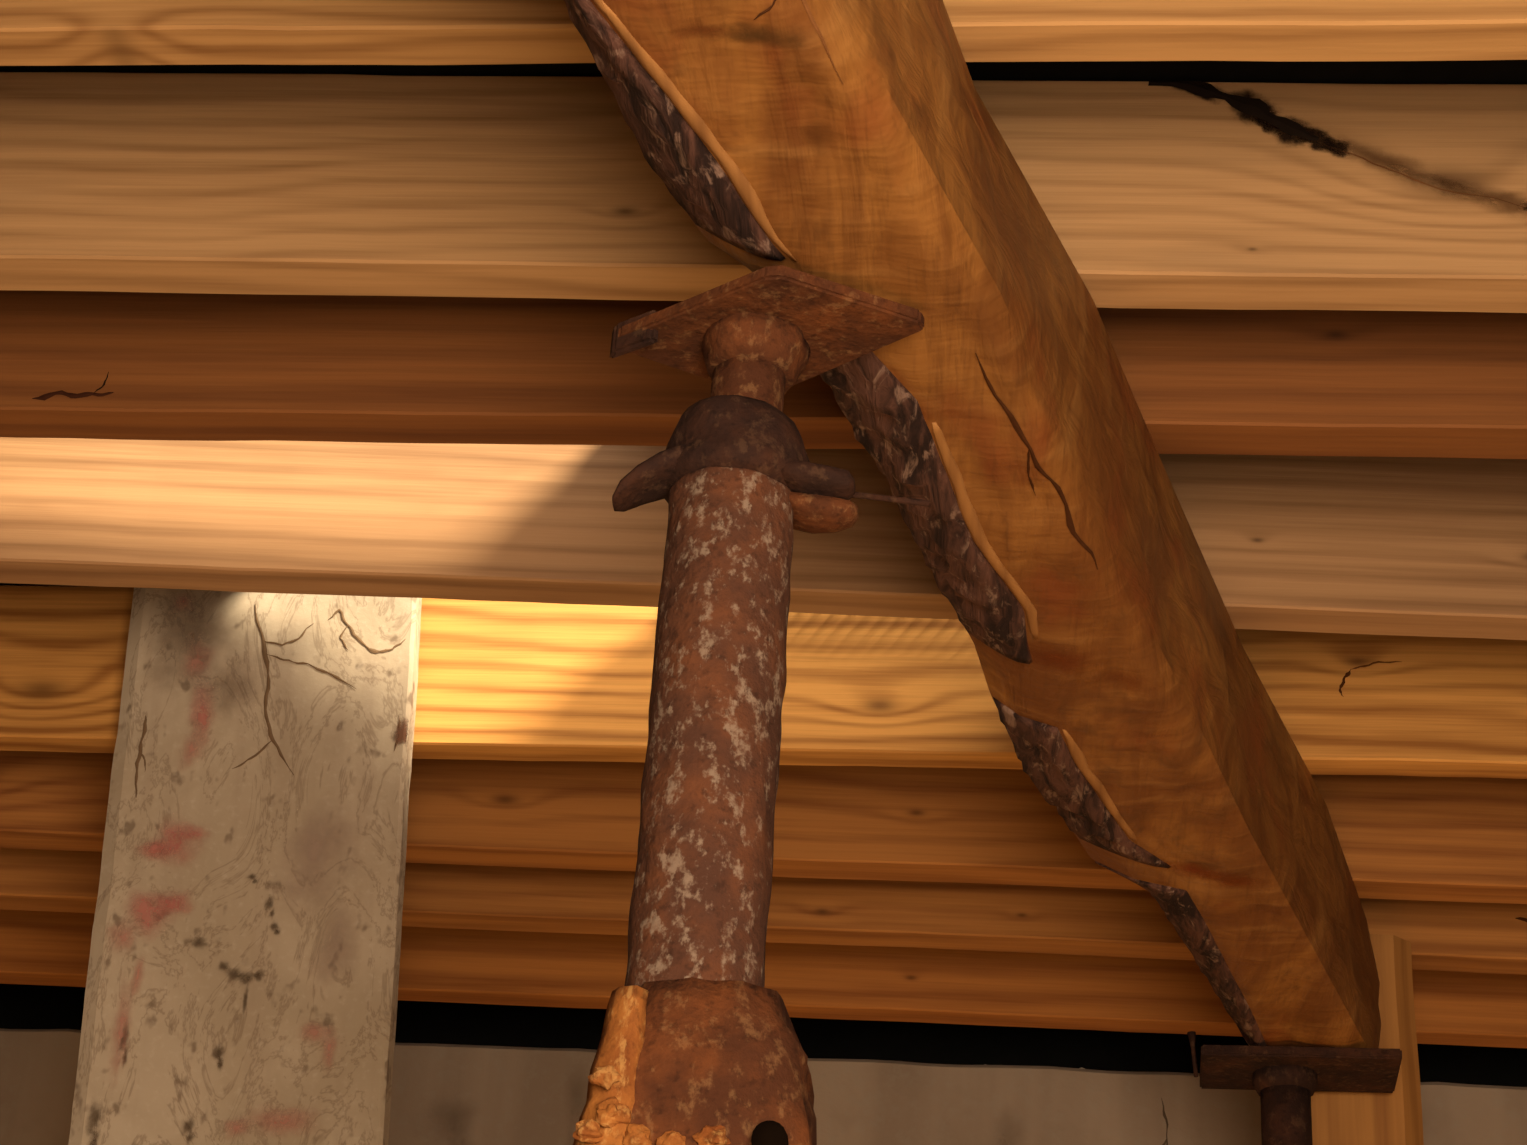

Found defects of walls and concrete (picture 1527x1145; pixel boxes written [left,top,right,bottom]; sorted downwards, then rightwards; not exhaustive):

crack [1148,80,1527,210]
crack [975,353,1098,570]
crack [232,603,404,775]
rust [572,1065,731,1145]